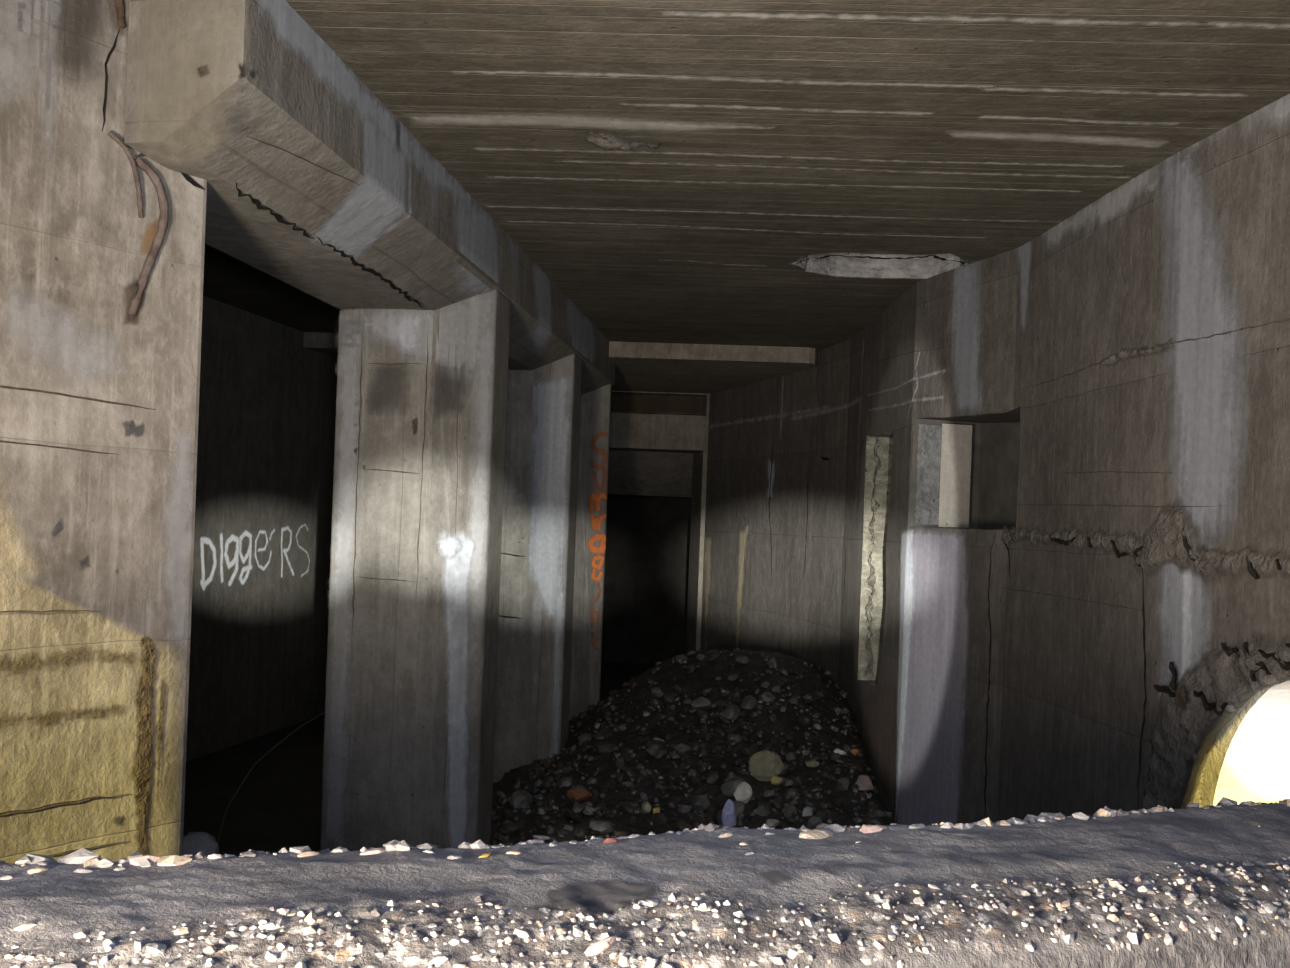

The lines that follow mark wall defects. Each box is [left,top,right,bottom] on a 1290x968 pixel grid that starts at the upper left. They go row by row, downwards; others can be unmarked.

spalling [792,251,968,279]
spalling [1001,505,1290,580]
spalling [1141,635,1290,810]